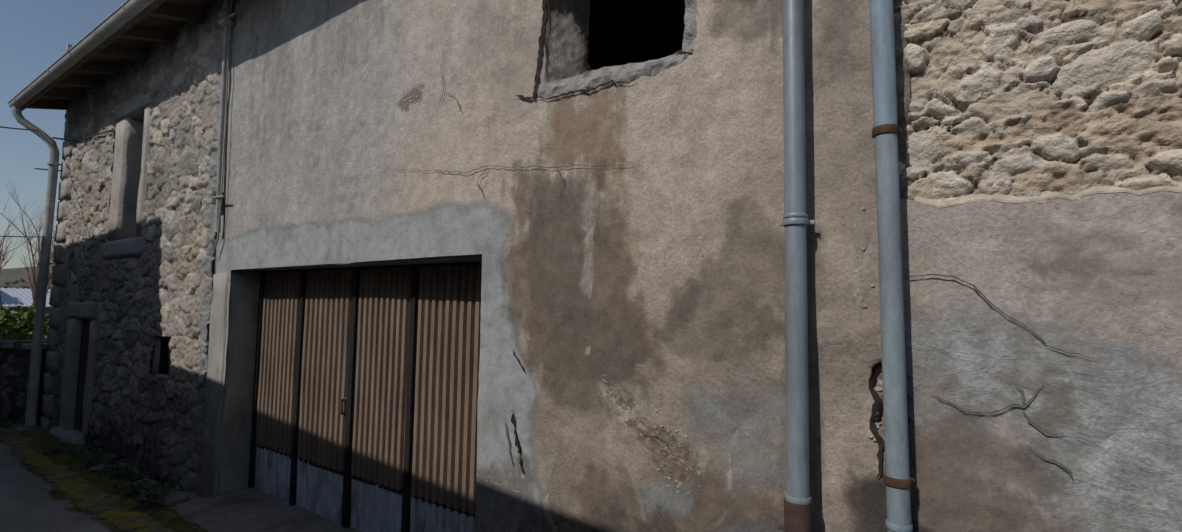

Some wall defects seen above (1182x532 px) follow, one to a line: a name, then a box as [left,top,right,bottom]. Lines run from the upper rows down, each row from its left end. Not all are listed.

crack [516,0,634,101]
damp [511,172,661,406]
crack [905,274,1094,359]
crack [505,413,524,475]
spalling [867,362,884,478]
crack [934,385,1074,480]